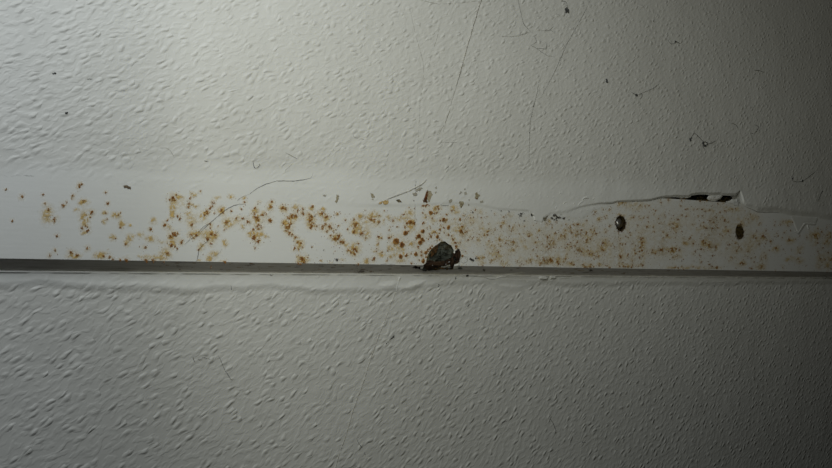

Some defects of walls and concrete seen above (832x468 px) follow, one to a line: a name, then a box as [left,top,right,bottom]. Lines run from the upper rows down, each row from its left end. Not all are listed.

rust [61,191,131,234]
rust [110,190,801,274]